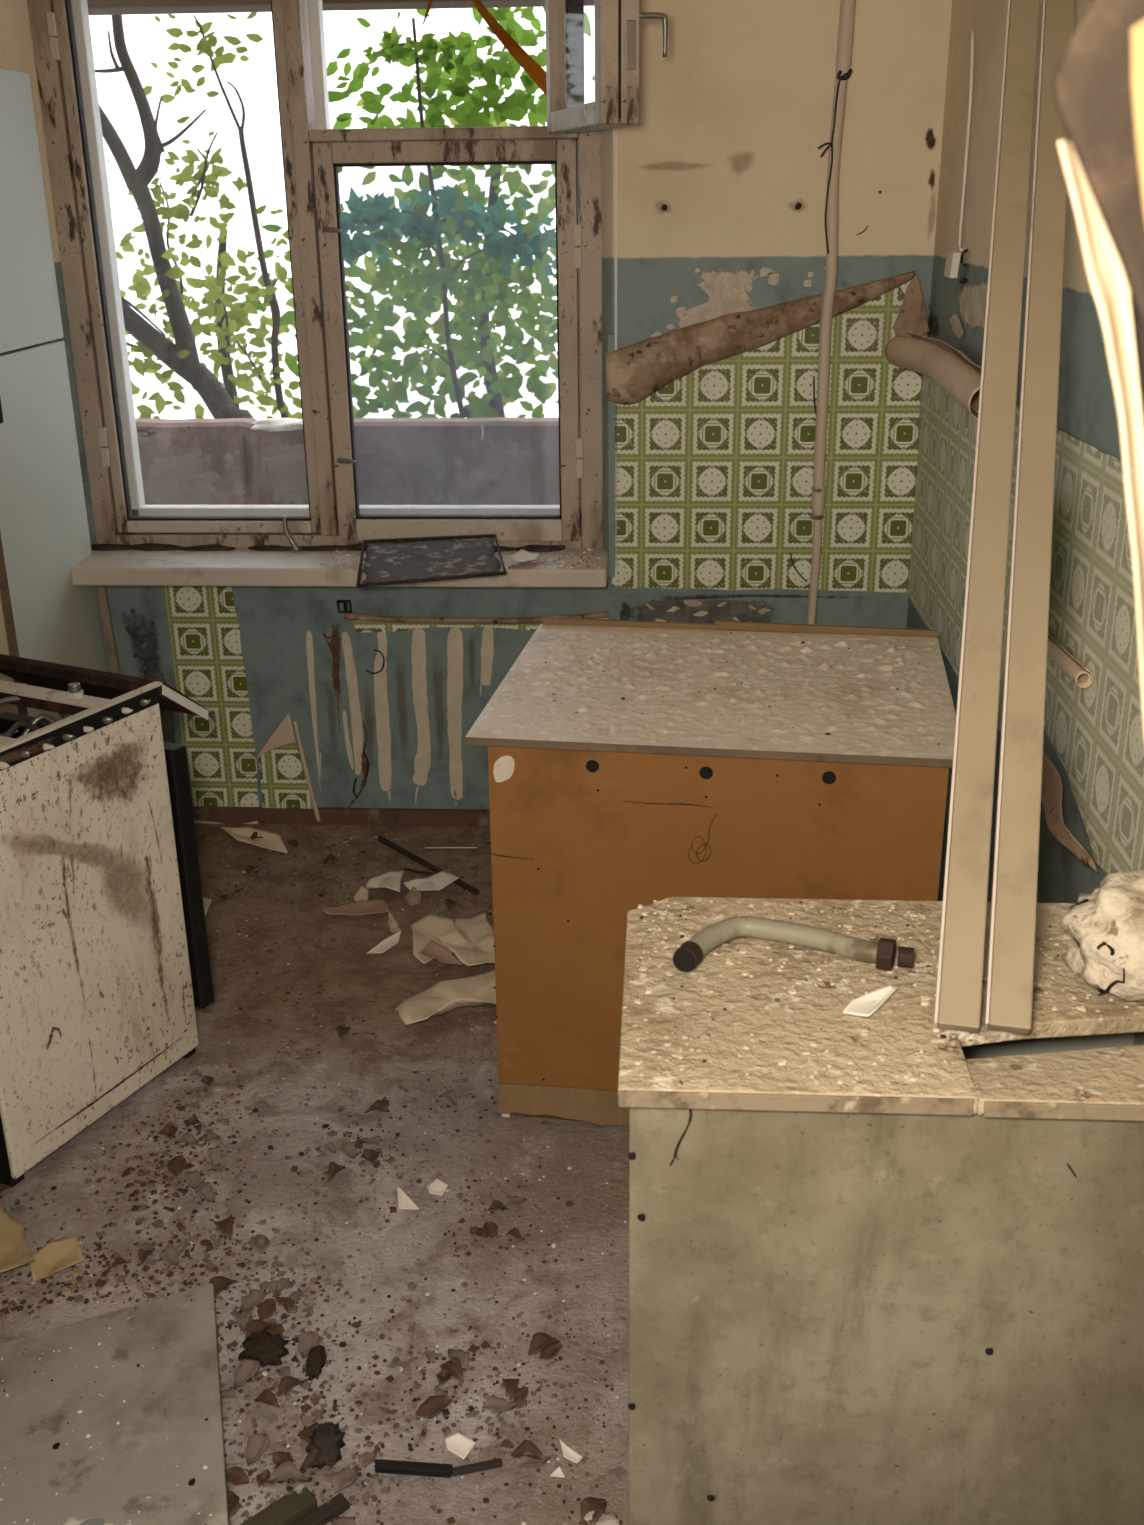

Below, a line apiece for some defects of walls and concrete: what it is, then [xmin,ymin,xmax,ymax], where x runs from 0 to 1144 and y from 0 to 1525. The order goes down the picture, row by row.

peeling [651,267,780,337]
peeling [306,630,322,792]
peeling [342,631,392,802]
peeling [411,627,494,805]